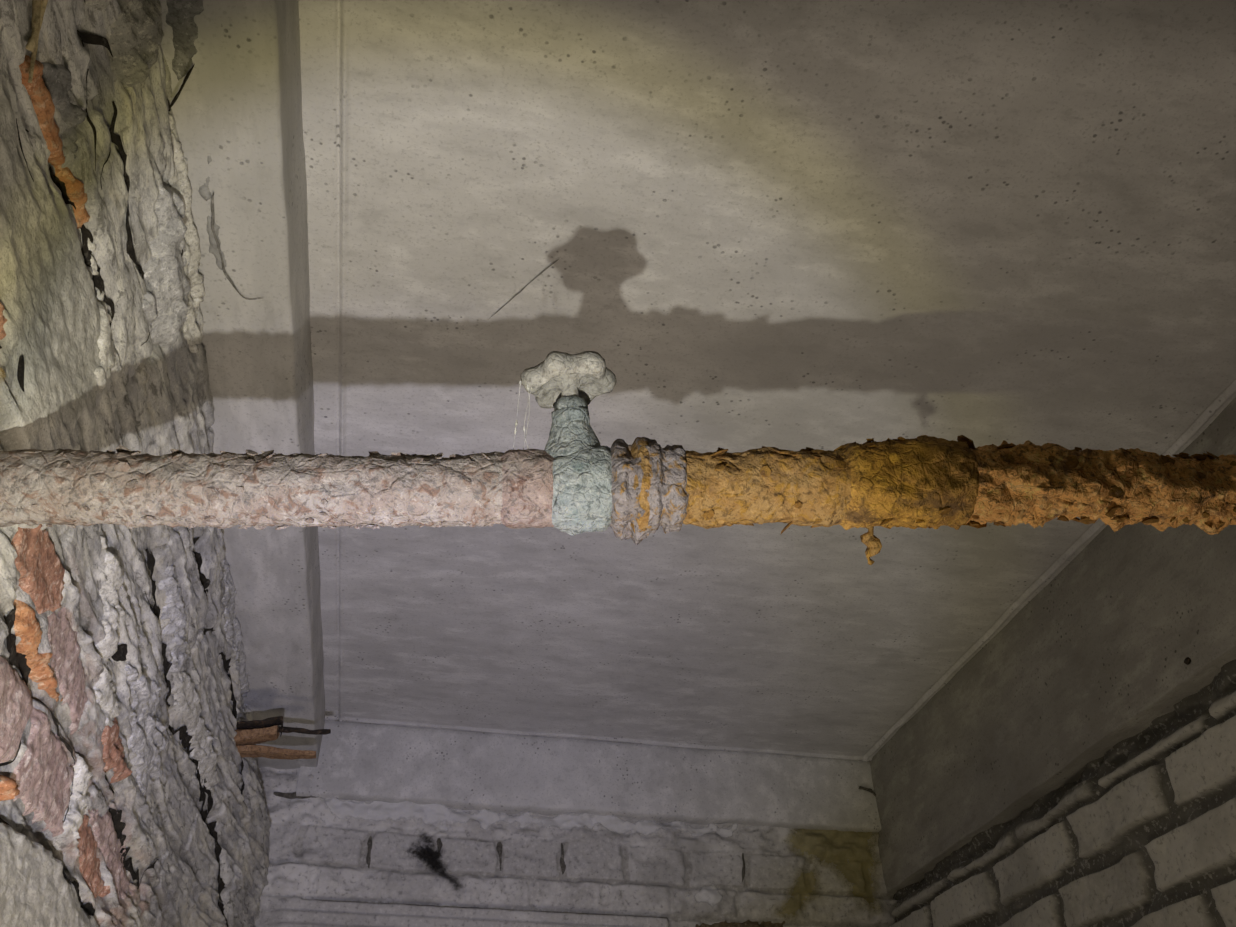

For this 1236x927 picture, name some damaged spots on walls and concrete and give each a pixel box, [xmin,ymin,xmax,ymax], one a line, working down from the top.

spalling [160,0,204,98]
spalling [19,55,99,275]
peeling [167,113,205,353]
peeling [94,290,116,391]
peeling [106,445,141,489]
peeling [170,449,328,465]
peeling [368,451,505,468]
peeling [188,487,493,706]
spalling [0,504,220,900]
damp [778,829,880,917]